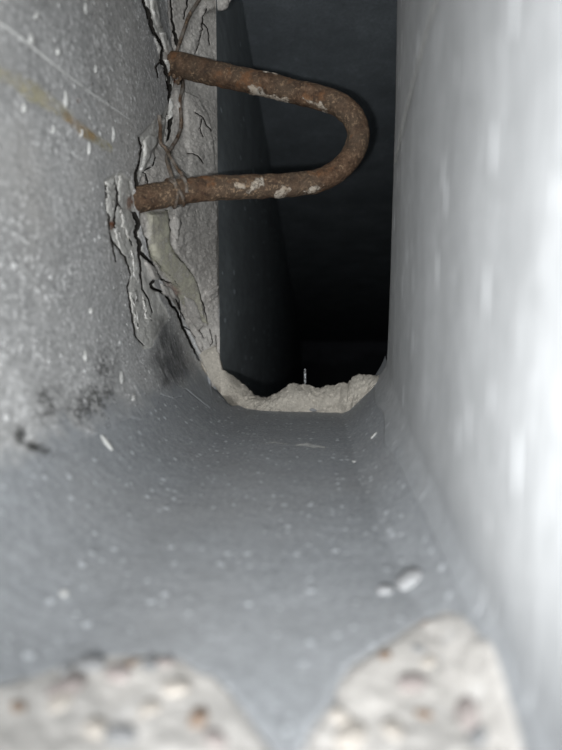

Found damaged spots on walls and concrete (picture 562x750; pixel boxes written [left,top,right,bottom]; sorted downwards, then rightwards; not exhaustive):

crack [105,137,217,361]
spalling [104,0,231,354]
crack [142,0,210,141]